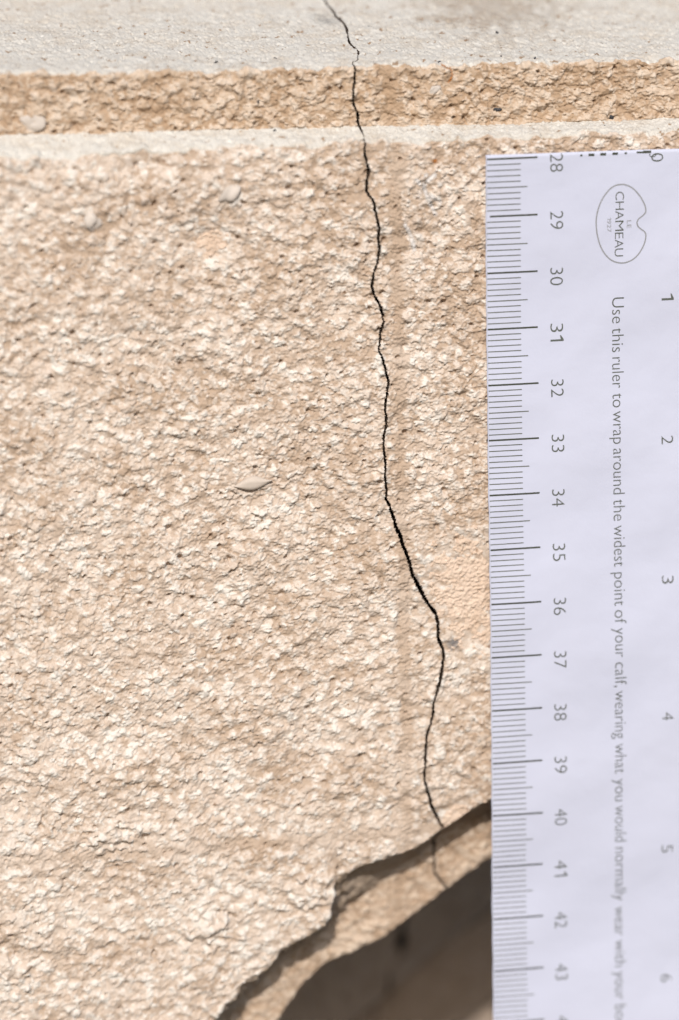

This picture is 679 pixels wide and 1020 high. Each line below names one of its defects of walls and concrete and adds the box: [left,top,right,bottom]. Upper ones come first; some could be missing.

crack [324,0,447,888]
spalling [416,525,490,659]
spalling [441,795,487,827]
crack [372,919,407,1020]